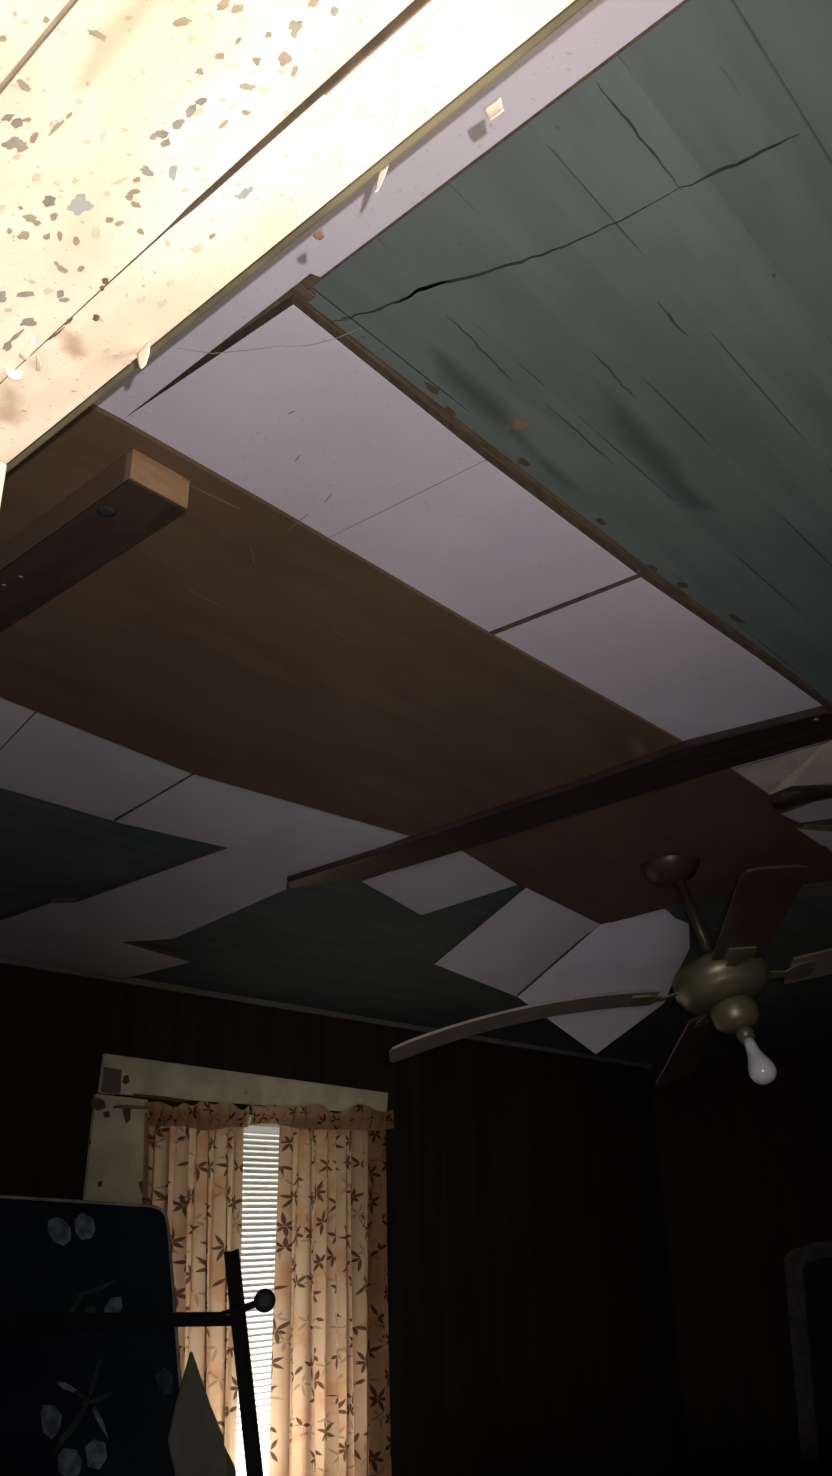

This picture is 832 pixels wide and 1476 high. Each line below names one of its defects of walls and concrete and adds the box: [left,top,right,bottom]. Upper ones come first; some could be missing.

peeling [87,29,107,41]
peeling [11,79,31,92]
peeling [0,98,83,160]
peeling [149,0,339,147]
peeling [484,96,504,120]
peeling [0,165,200,246]
peeling [375,164,389,193]
crack [332,82,800,380]
peeling [0,261,85,380]
peeling [103,341,151,369]
crack [593,353,636,398]
crack [546,404,612,463]